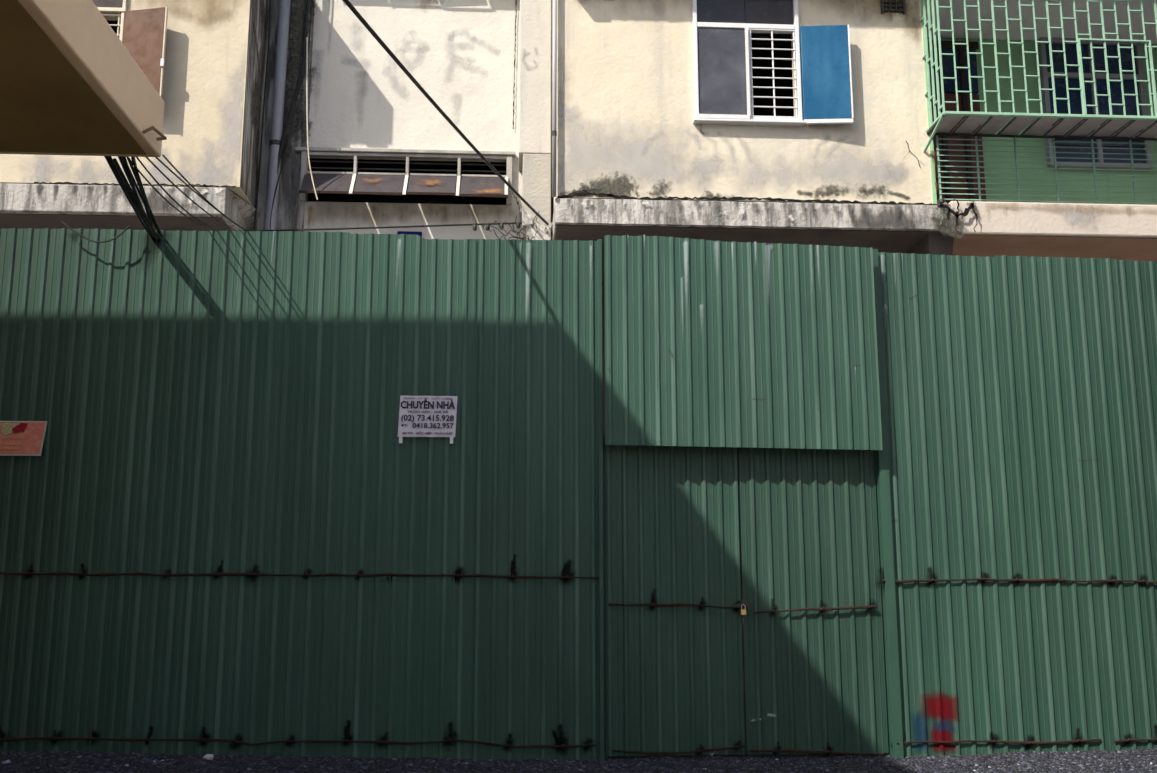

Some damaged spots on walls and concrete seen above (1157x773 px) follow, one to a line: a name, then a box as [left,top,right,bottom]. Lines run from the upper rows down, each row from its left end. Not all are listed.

damp [73,0,267,212]
damp [36,164,66,195]
damp [561,136,687,222]
damp [695,192,738,211]
damp [787,154,914,227]